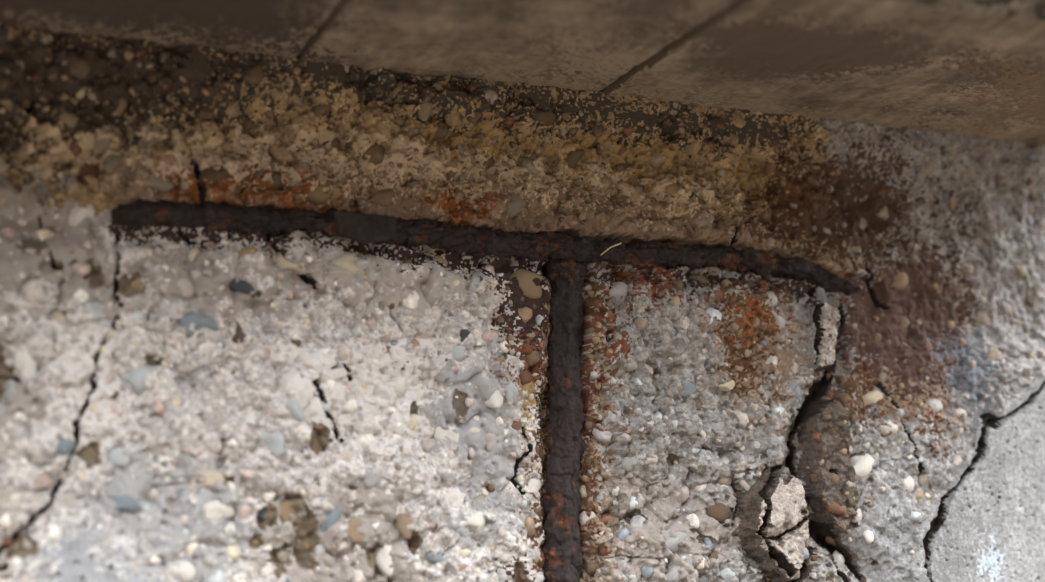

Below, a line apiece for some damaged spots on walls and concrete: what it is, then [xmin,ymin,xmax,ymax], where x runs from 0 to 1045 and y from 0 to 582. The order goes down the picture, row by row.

spalling [84,258,106,289]
water stain [0,0,1045,432]
crack [0,234,124,571]
water stain [29,307,151,455]
water stain [225,316,466,475]
spalling [366,542,394,582]
spalling [410,373,472,417]
rust [87,126,992,582]
spalling [689,533,767,582]
crack [756,264,890,582]
crack [874,382,925,476]
crack [923,381,1045,582]